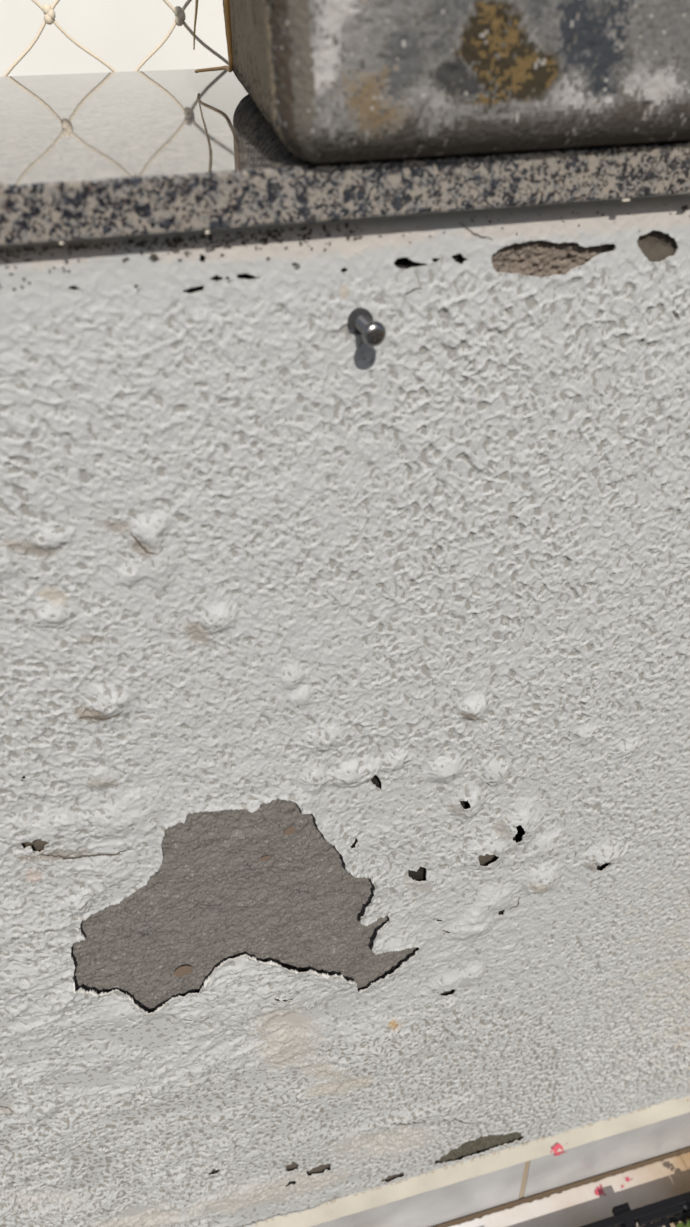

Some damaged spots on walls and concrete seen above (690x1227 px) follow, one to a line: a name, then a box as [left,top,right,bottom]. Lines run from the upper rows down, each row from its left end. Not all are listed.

spalling [492,240,616,278]
peeling [71,799,420,1015]
spalling [434,1132,524,1165]